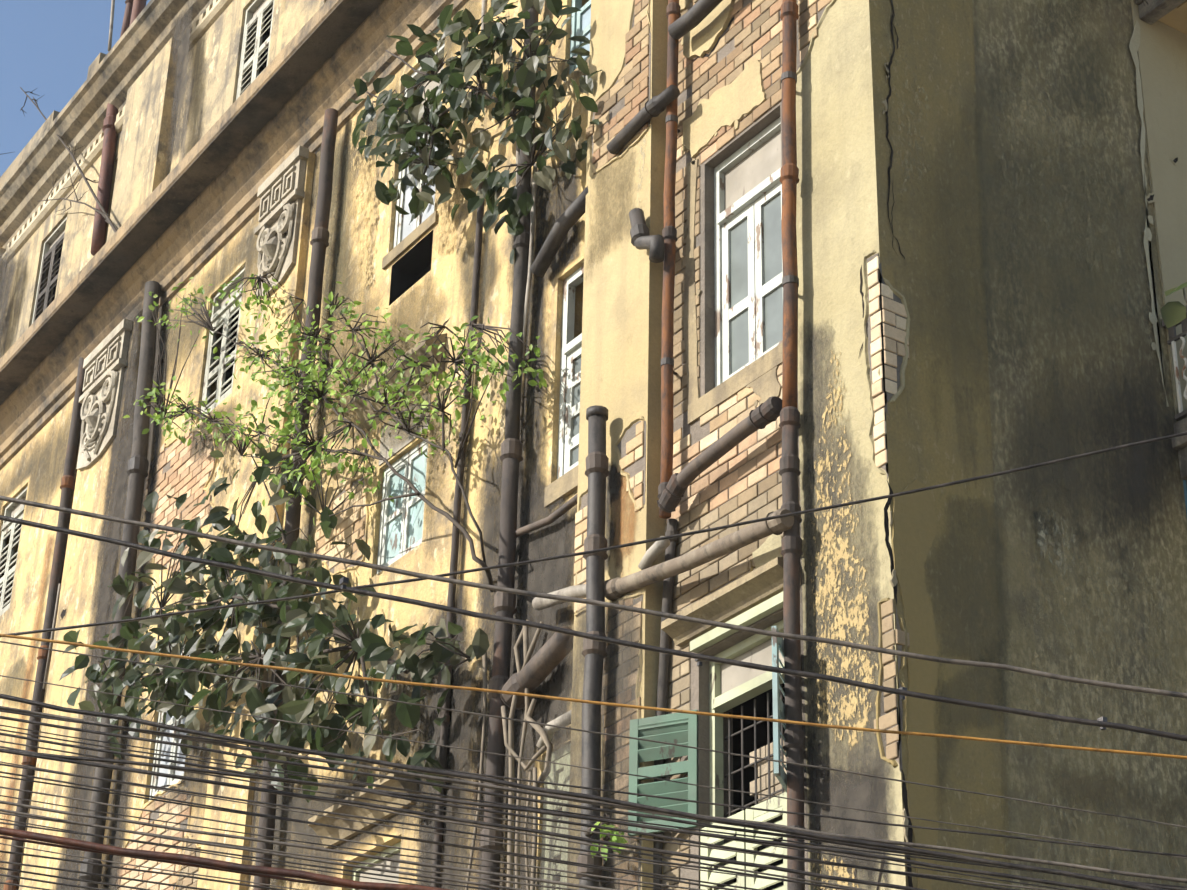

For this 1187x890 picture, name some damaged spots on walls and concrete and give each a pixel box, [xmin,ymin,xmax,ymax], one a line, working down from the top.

spalling [586,0,652,175]
peeling [680,0,735,60]
spalling [796,0,836,74]
crack [882,0,905,259]
leakage [0,246,16,331]
spalling [862,250,910,479]
spalling [614,416,646,512]
leakage [801,330,890,890]
peeling [806,351,910,772]